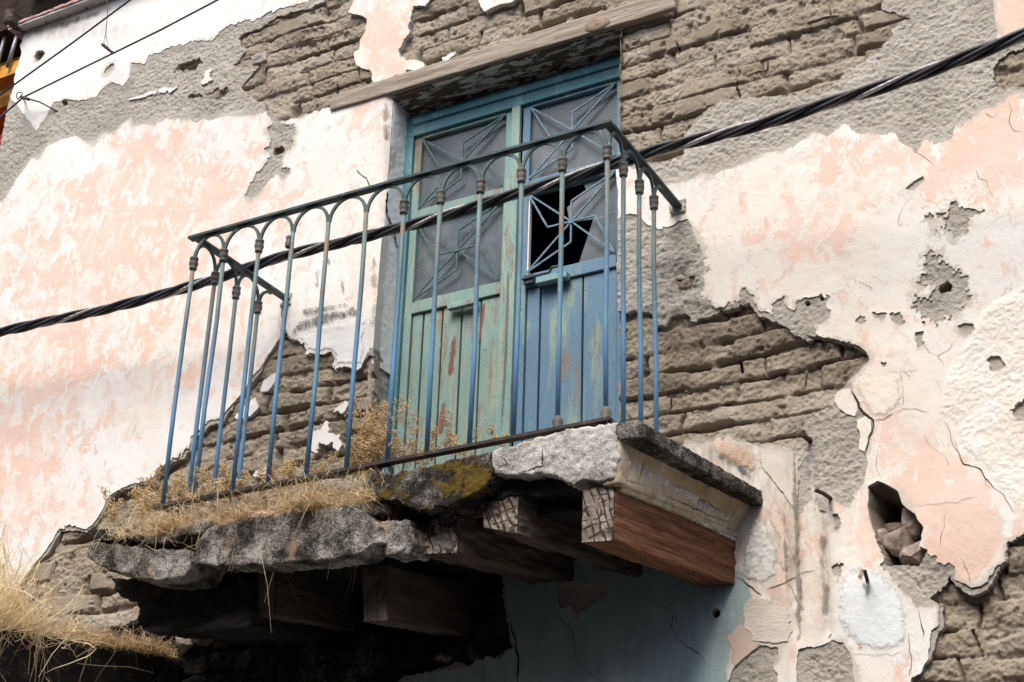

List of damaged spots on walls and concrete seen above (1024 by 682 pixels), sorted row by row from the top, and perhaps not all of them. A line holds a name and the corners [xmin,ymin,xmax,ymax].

spalling [0,0,637,203]
spalling [619,0,1024,184]
flaking render [925,201,985,237]
spalling [3,330,514,682]
spalling [616,214,1024,682]
crack [851,346,1013,543]